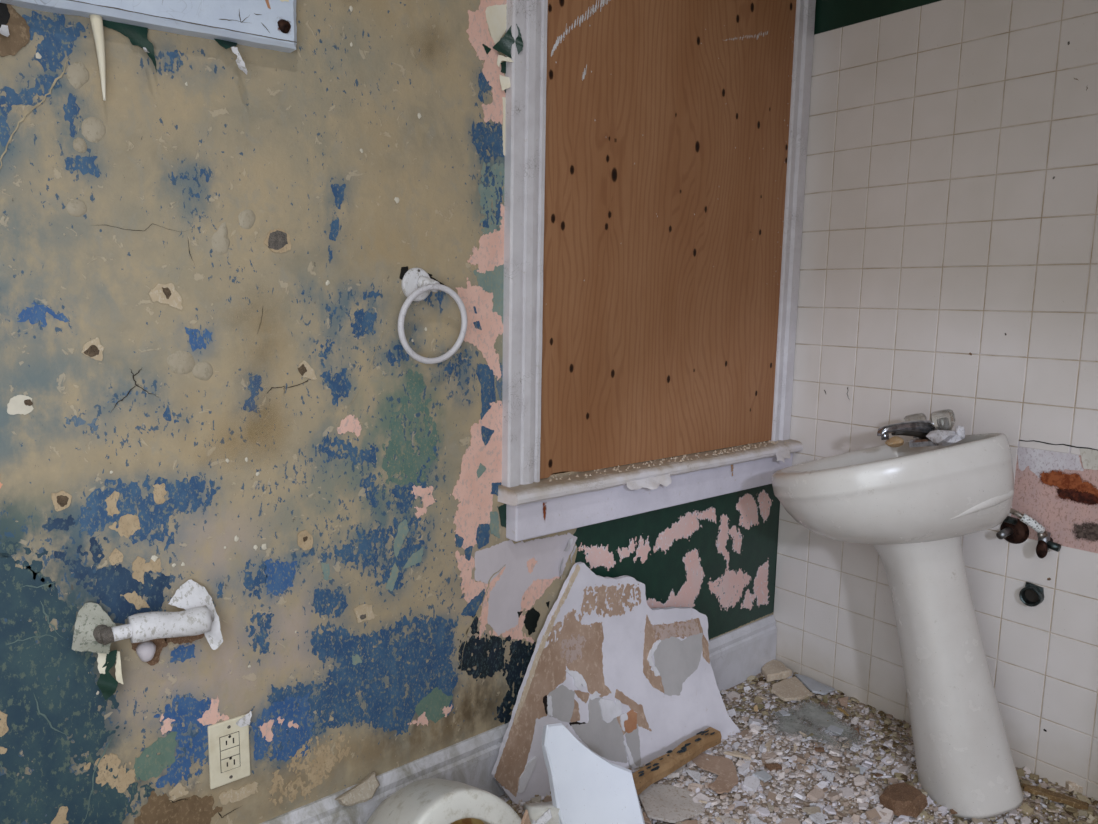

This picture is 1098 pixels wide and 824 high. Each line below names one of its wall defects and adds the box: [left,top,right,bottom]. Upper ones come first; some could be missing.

spalling [0,3,30,57]
peeling [103,20,157,73]
peeling [214,39,248,75]
peeling [493,24,523,93]
peeling [0,73,61,146]
flaking render [7,395,34,415]
peeling [1011,441,1098,553]
flaking render [105,491,162,610]
peeling [559,490,773,611]
flaking render [0,711,9,754]
flaking render [84,733,351,824]
flaking render [51,806,69,824]